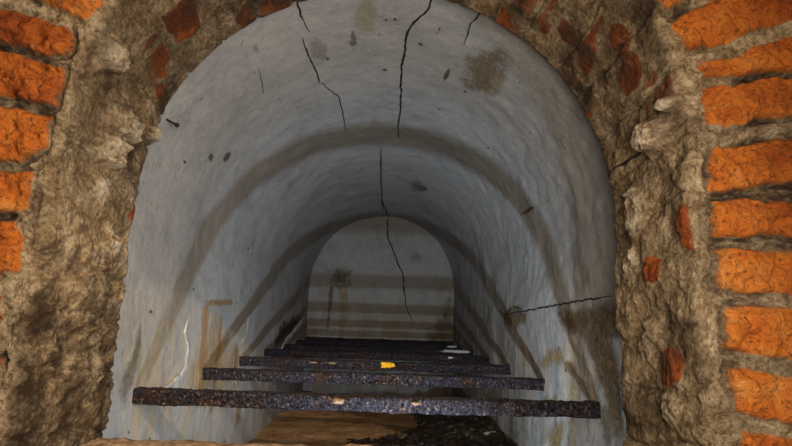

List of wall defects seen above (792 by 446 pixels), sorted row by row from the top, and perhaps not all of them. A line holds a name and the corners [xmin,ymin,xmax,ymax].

crack [297,2,346,130]
crack [397,0,432,137]
damp [465,51,506,92]
crack [380,150,411,318]
rust [191,300,238,390]